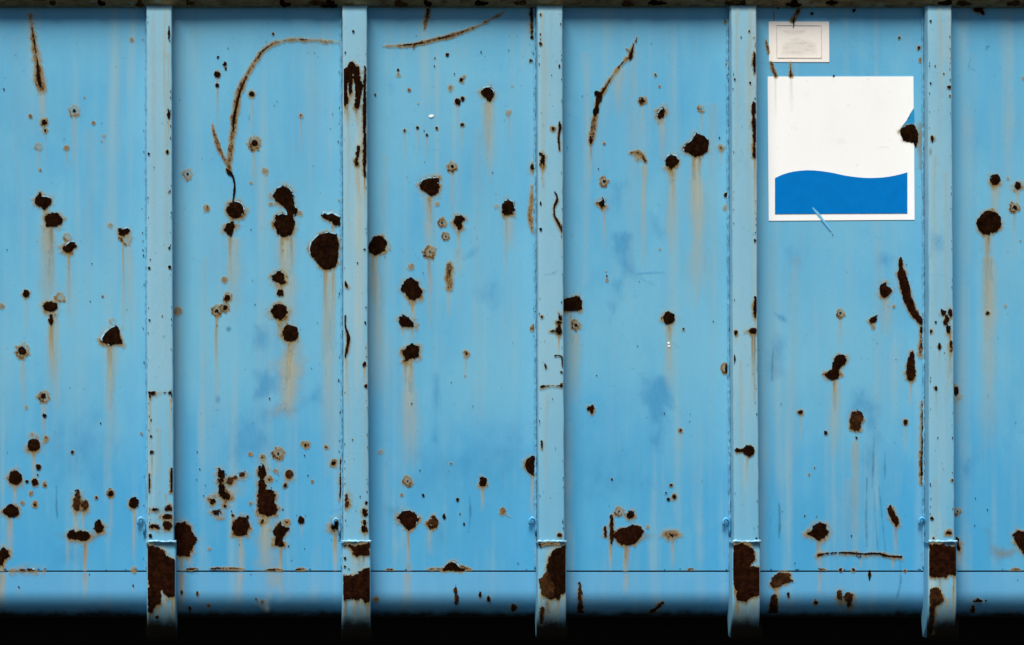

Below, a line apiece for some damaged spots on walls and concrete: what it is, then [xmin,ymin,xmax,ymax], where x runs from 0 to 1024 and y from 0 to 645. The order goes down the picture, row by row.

corrosion [269,184,302,288]
corrosion [307,199,345,298]
corrosion [330,51,367,192]
corrosion [664,132,734,212]
corrosion [898,124,930,146]
corrosion [976,174,1024,259]
corrosion [98,320,124,366]
corrosion [822,354,848,394]
corrosion [879,263,931,385]
corrosion [128,468,251,594]
corrosion [196,446,311,571]
corrosion [603,506,649,567]